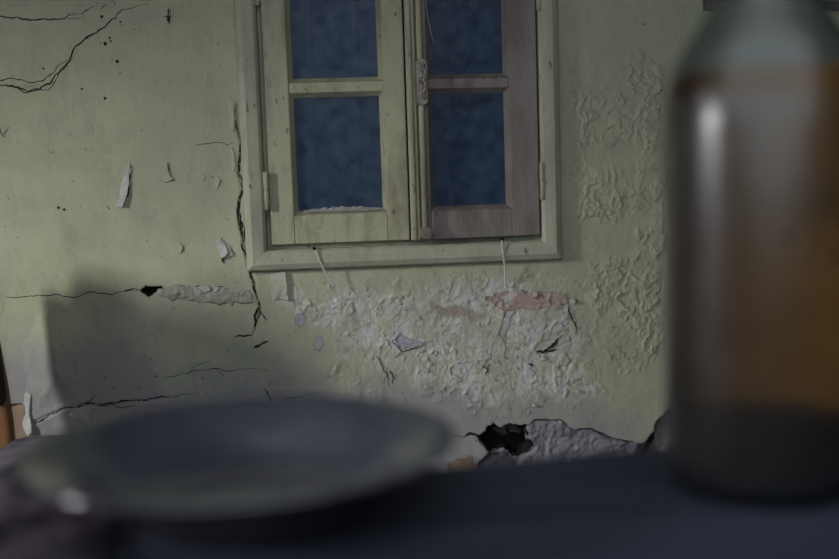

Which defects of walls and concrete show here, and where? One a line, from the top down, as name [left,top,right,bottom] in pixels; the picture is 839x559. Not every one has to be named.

crack [0,1,149,93]
crack [34,110,269,424]
peeling [216,238,233,264]
peeling [255,47,671,464]
crack [7,288,138,298]
spalling [153,284,256,306]
spalling [11,392,32,439]